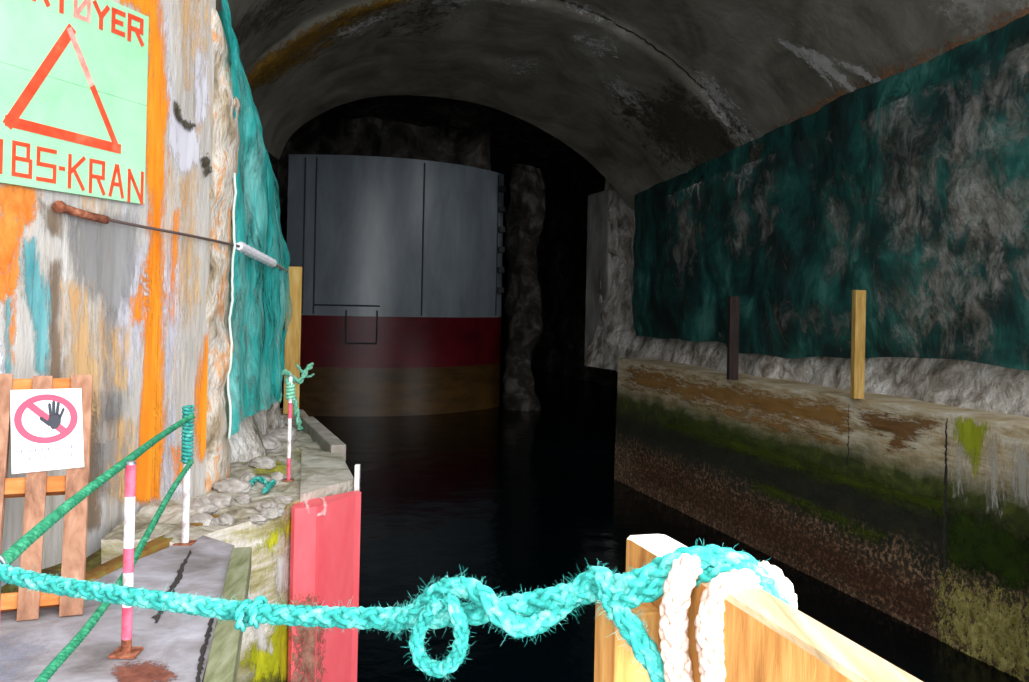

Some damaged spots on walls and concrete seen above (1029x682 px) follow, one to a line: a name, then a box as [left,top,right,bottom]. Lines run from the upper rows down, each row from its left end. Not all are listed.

rust [239,0,412,94]
efflorescence [985,435,1029,512]
crack [151,550,192,623]
rust [112,657,178,682]
crack [195,618,214,682]